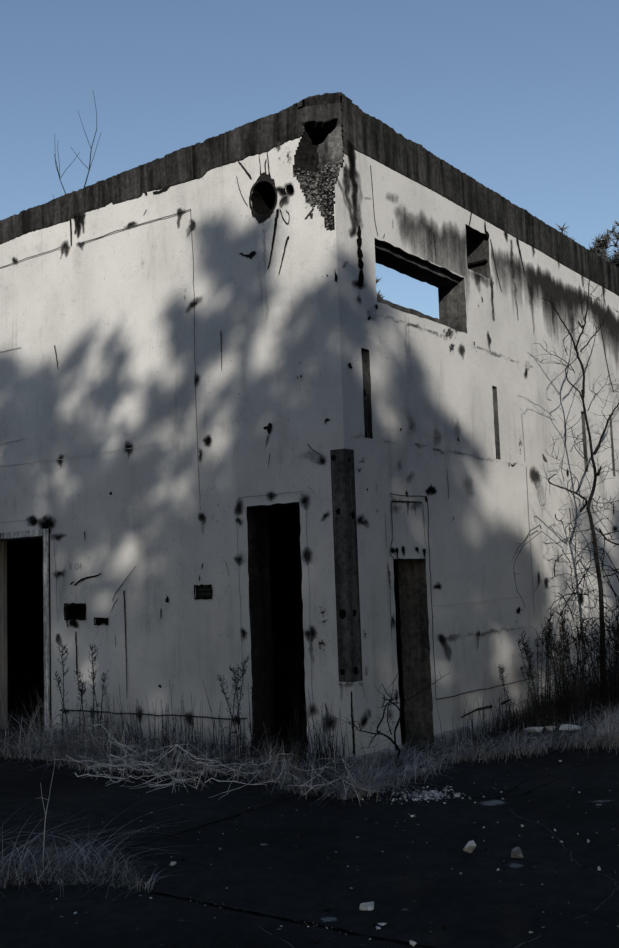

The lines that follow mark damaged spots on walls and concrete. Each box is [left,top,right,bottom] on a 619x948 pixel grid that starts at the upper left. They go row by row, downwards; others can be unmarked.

spalling [293,103,344,231]
damp [338,138,361,228]
damp [397,209,619,357]